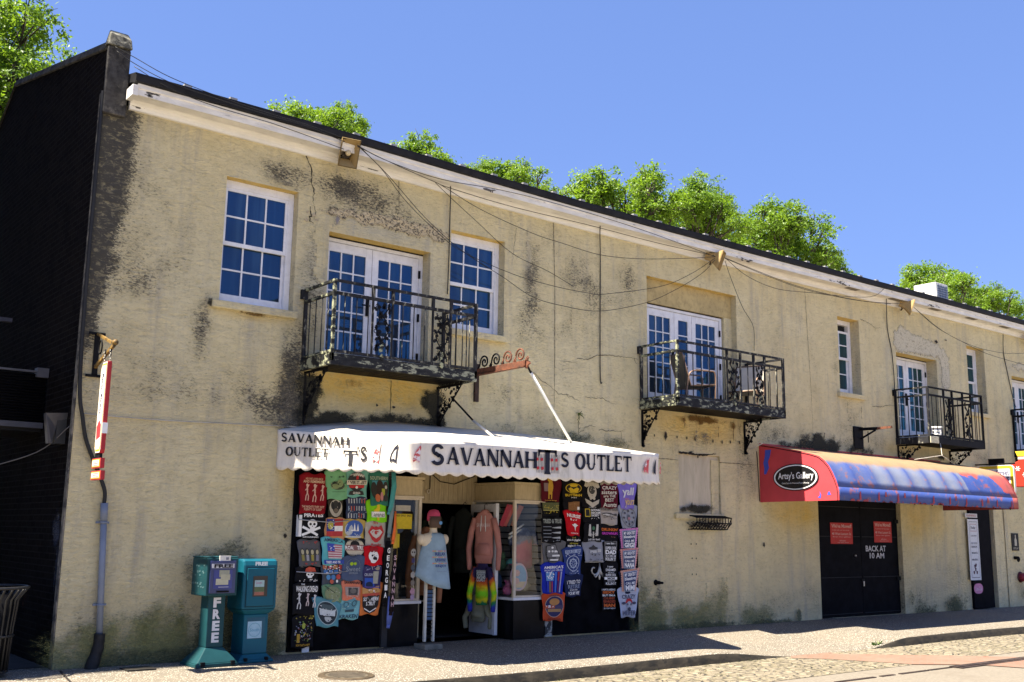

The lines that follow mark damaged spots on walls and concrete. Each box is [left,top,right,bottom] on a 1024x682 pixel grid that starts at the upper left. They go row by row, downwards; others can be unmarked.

crack [304,156,318,223]
water stain [779,432,873,455]